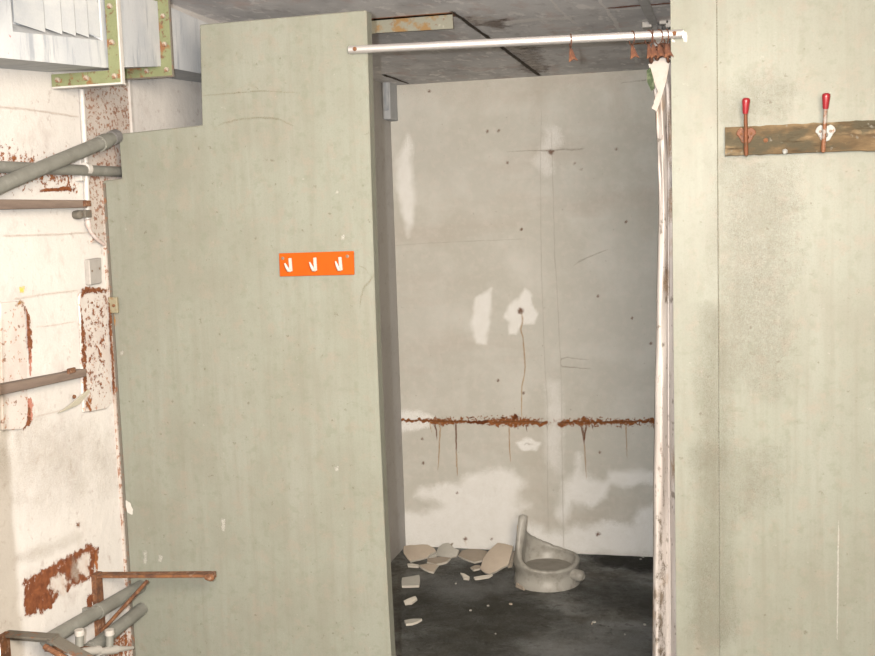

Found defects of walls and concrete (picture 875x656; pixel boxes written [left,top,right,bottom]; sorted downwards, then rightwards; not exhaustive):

rust [0,139,47,162]
rust [13,174,78,195]
flaking render [394,134,419,239]
rust [80,286,116,411]
flaking render [468,287,538,345]
rust [401,307,654,477]